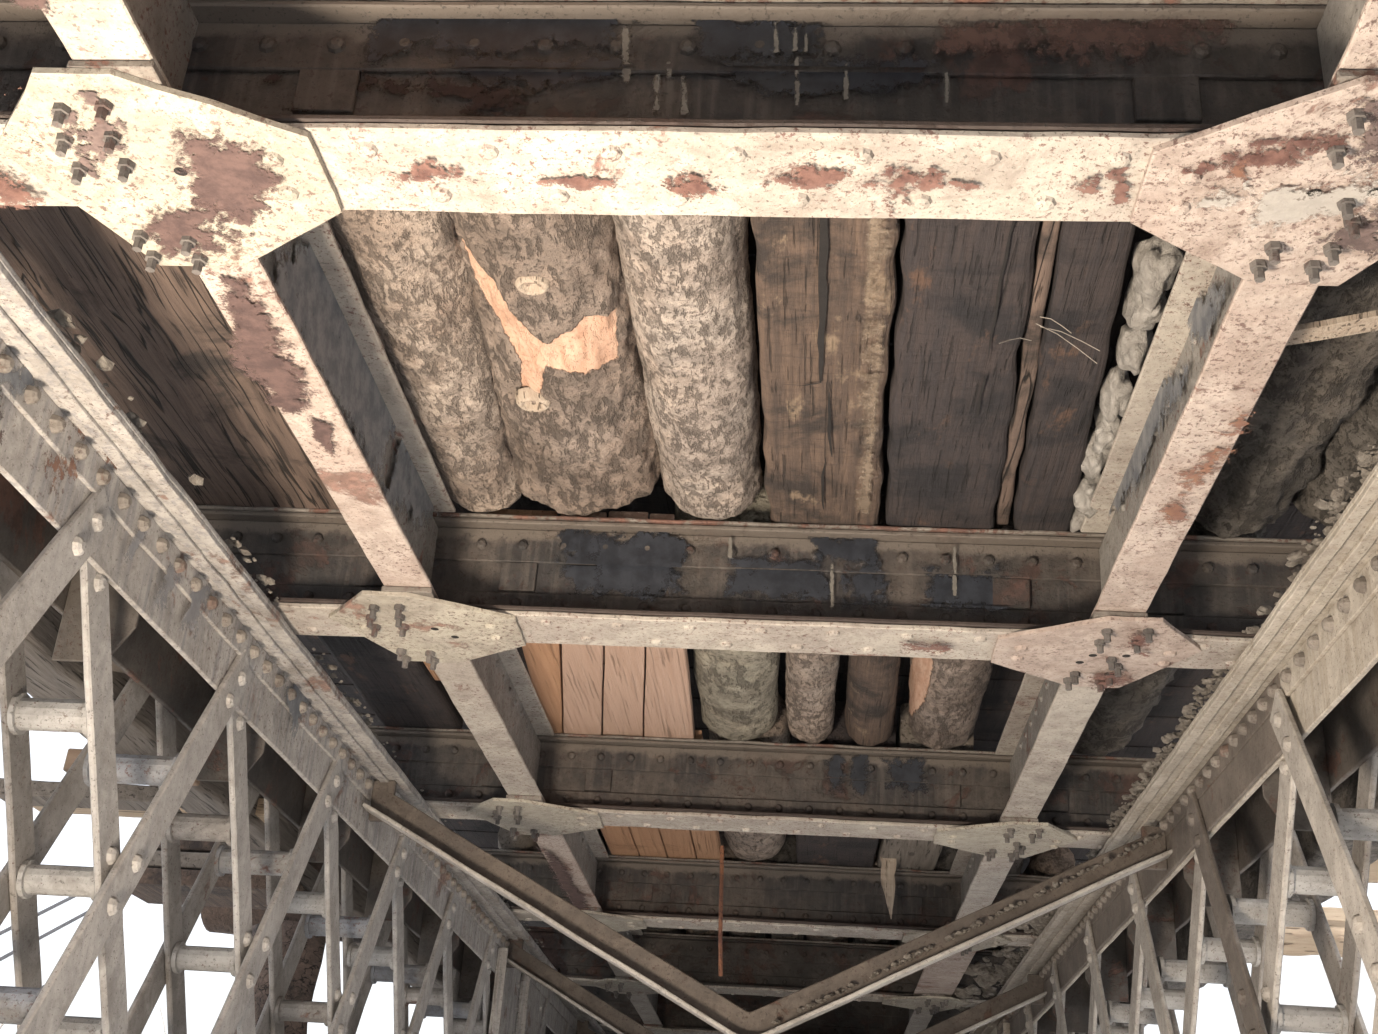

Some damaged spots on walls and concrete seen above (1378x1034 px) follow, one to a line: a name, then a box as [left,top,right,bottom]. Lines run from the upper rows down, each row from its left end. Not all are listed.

peeling [691,20,940,99]
rust [0,110,46,210]
rust [51,88,128,181]
rust [529,176,619,192]
rust [661,171,727,202]
rust [762,160,980,218]
rust [1181,97,1378,191]
rust [1309,207,1378,260]
rust [132,125,335,457]
peeling [552,529,690,601]
peeling [920,563,1010,615]
peeling [824,754,928,798]